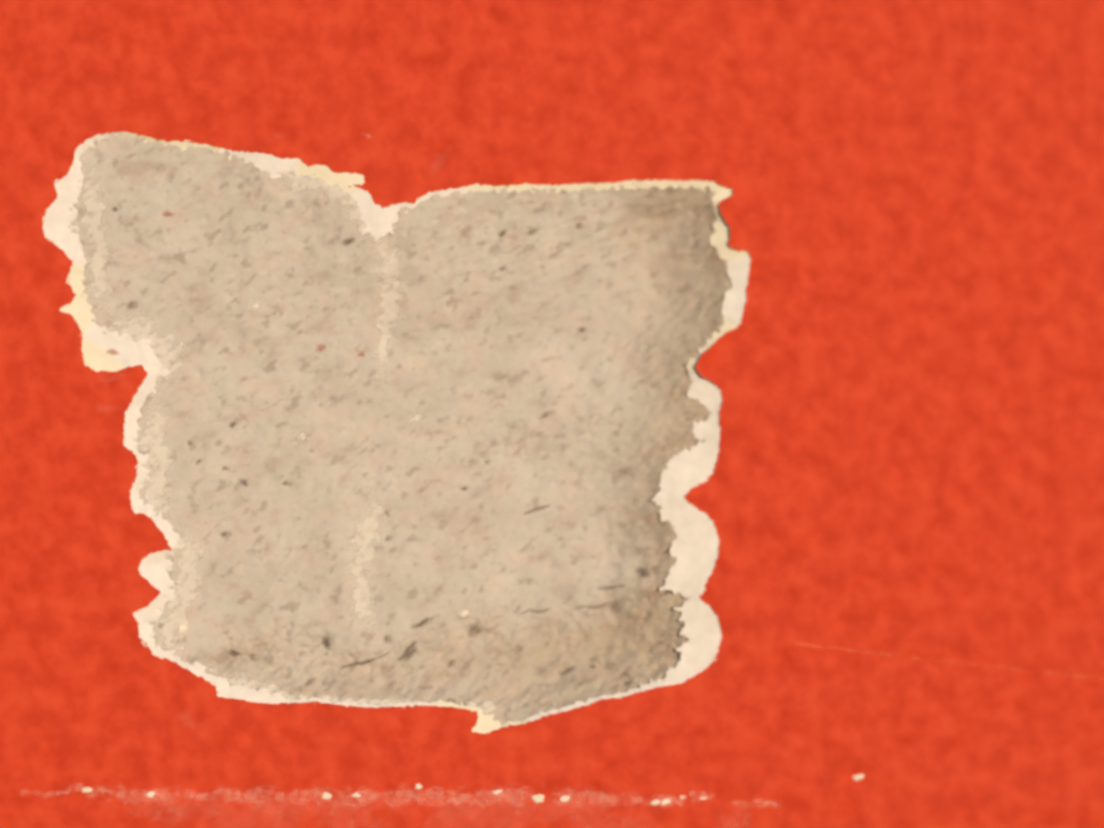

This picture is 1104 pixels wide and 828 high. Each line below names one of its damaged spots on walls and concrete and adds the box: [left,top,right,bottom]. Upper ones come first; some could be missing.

peeling [42,132,751,734]